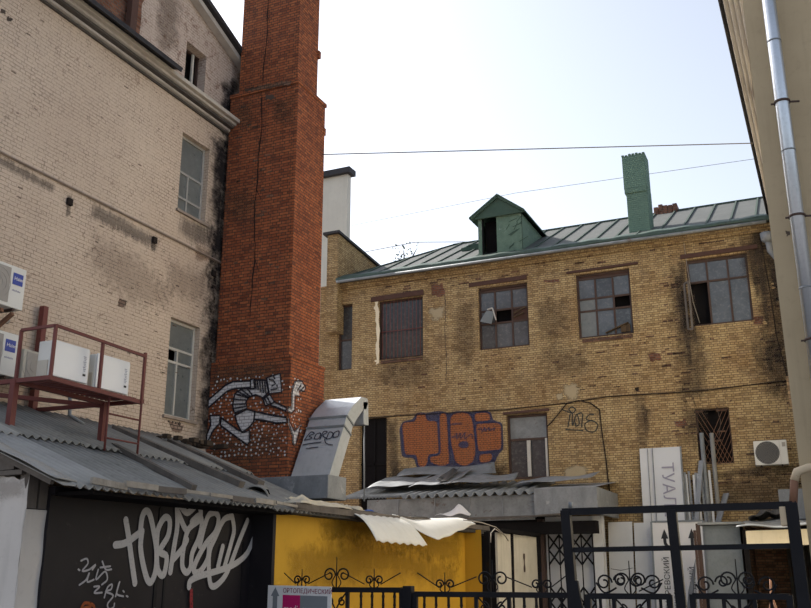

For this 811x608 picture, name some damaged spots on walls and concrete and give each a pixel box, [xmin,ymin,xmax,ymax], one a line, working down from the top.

water stain [94,209,156,250]
crack [249,0,269,309]